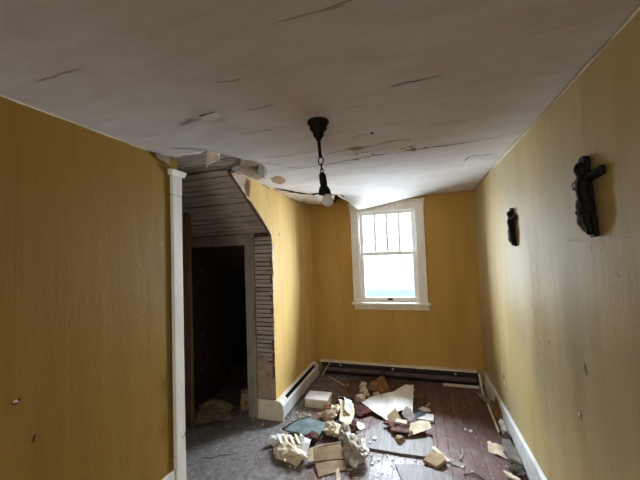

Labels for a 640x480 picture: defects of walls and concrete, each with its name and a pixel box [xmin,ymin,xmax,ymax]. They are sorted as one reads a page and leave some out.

crack [269,0,351,25]
crack [267,132,518,170]
peeling [233,160,290,185]